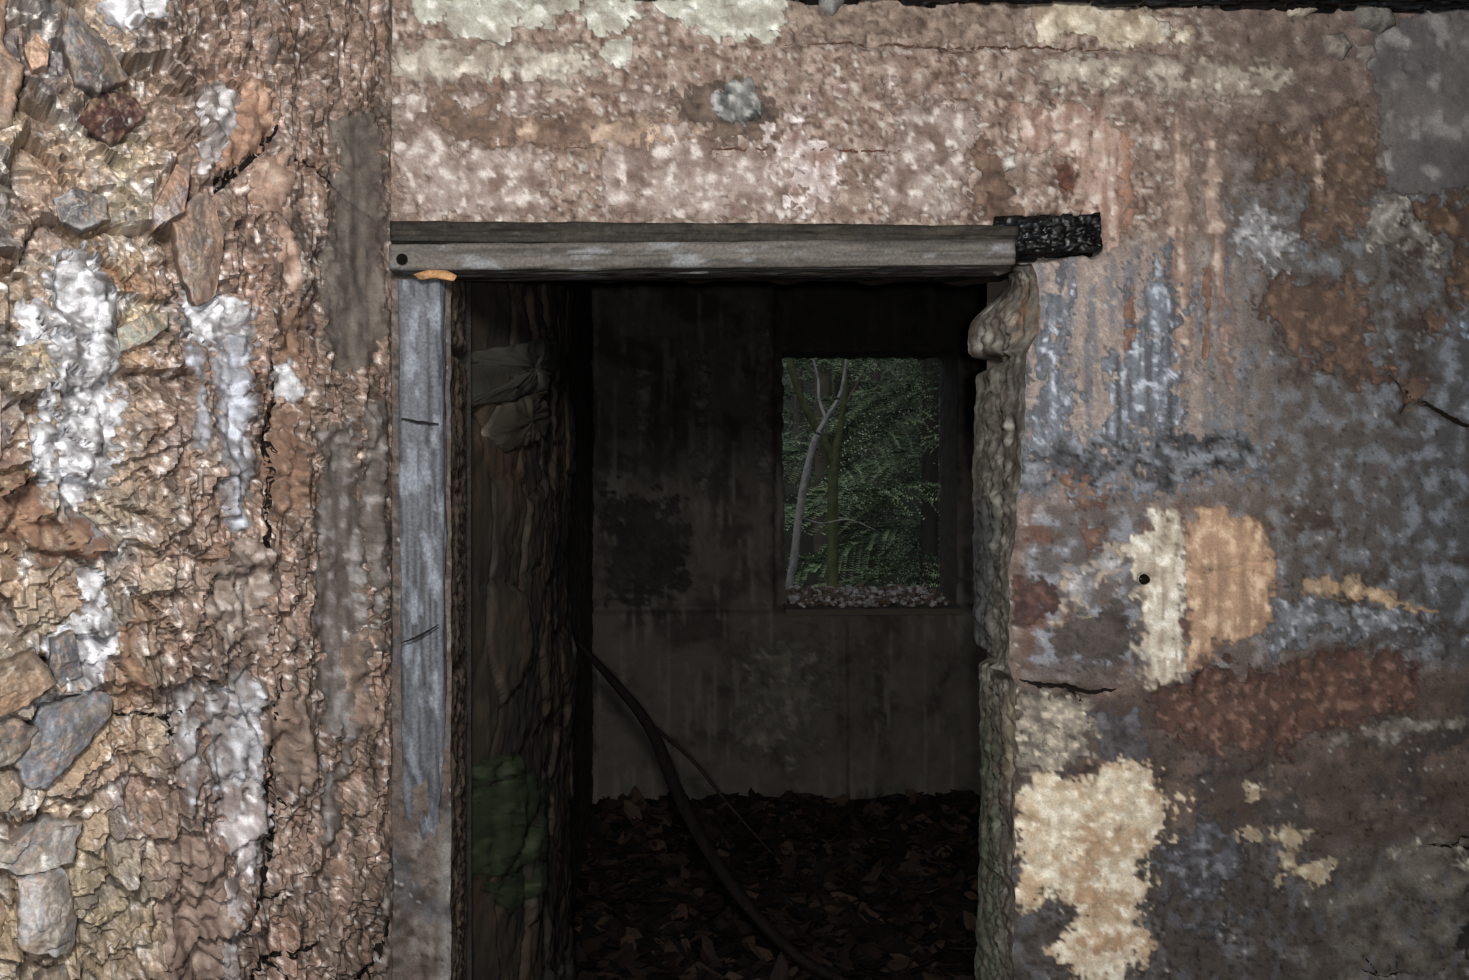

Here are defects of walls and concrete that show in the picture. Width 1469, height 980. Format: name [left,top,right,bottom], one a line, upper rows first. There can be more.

efflorescence [96,0,170,34]
efflorescence [195,80,243,175]
peeling [211,0,1196,373]
efflorescence [14,240,131,512]
efflorescence [176,289,309,547]
efflorescence [172,659,276,980]
crack [1019,679,1116,704]